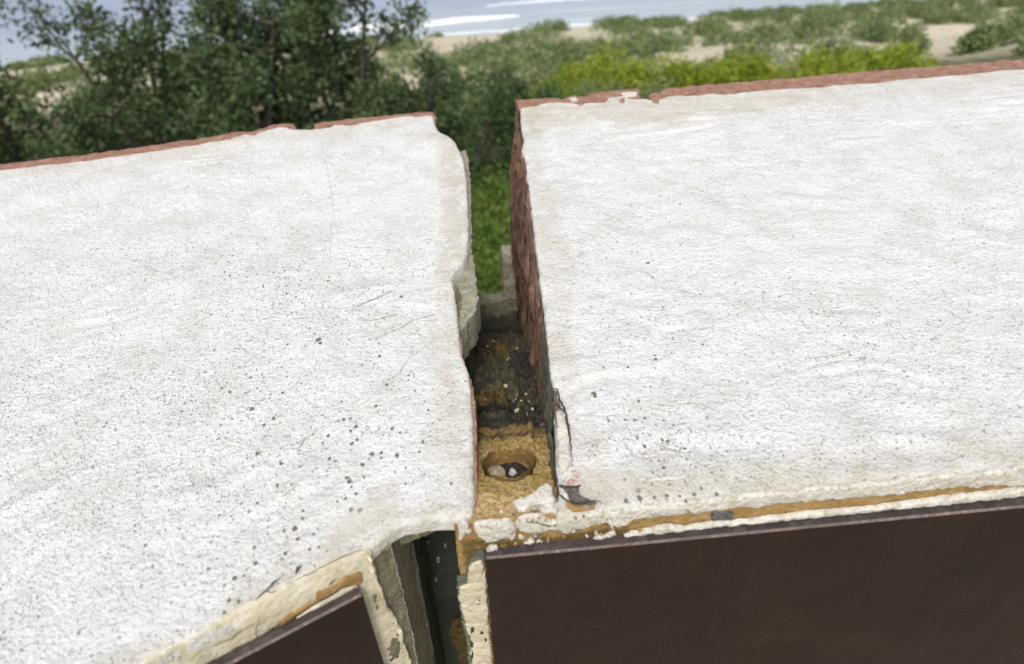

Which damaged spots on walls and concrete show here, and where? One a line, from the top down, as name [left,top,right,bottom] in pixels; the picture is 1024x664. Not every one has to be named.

spalling [278,531,433,664]
peeling [457,379,1024,664]